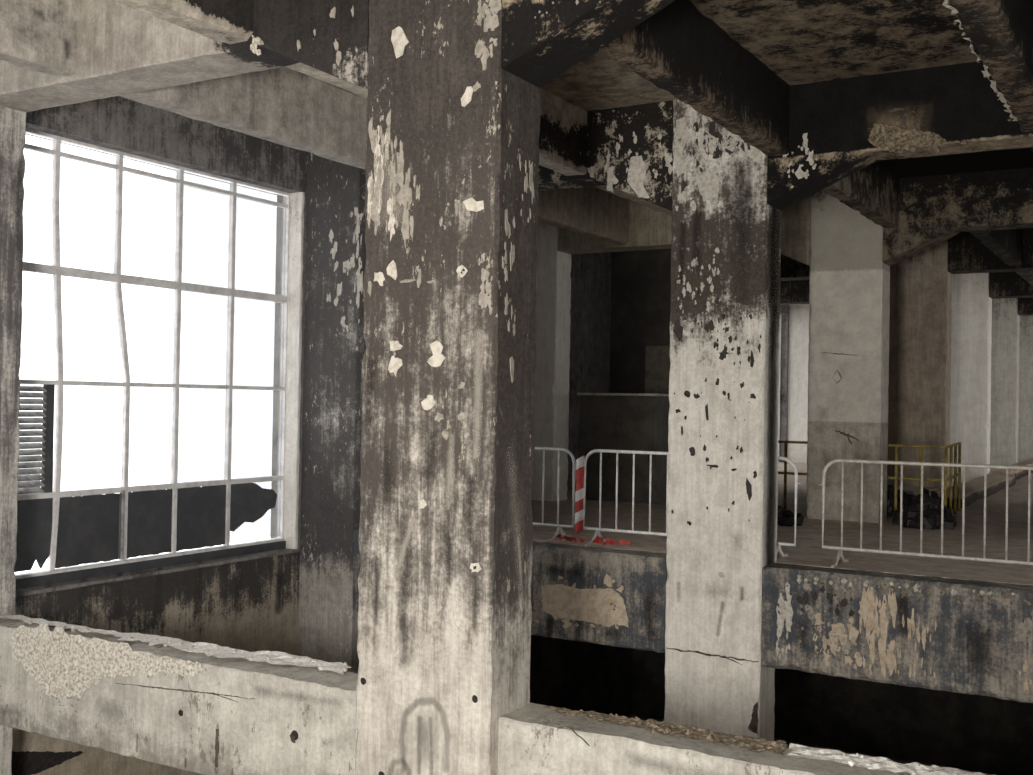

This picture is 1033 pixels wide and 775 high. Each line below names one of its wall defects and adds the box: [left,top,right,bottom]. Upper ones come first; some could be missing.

peeling [391,26,409,58]
peeling [461,0,502,107]
peeling [587,116,762,211]
peeling [783,133,817,188]
peeling [326,110,436,327]
peeling [479,155,534,331]
peeling [388,341,403,377]
peeling [427,341,446,367]
leakage [474,331,482,458]
peeling [673,247,762,367]
leakage [397,499,427,569]
leakage [898,596,908,633]